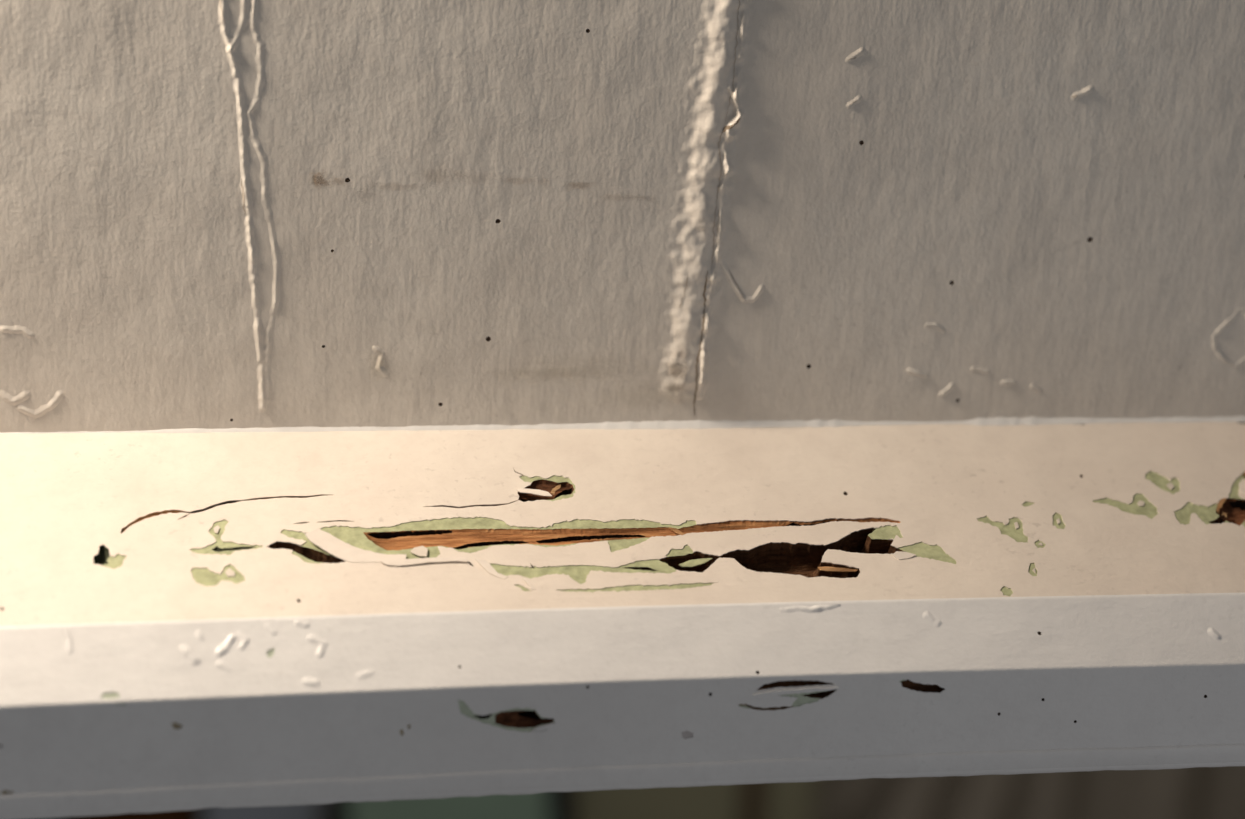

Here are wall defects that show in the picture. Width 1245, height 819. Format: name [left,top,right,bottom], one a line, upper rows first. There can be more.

crack [650,0,765,416]
spalling [516,476,575,502]
peeling [1145,471,1180,494]
peeling [1093,494,1158,519]
peeling [977,502,1046,548]
peeling [1052,513,1065,529]
peeling [93,545,126,569]
peeling [190,520,713,593]
peeling [892,551,916,560]
peeling [739,680,838,710]